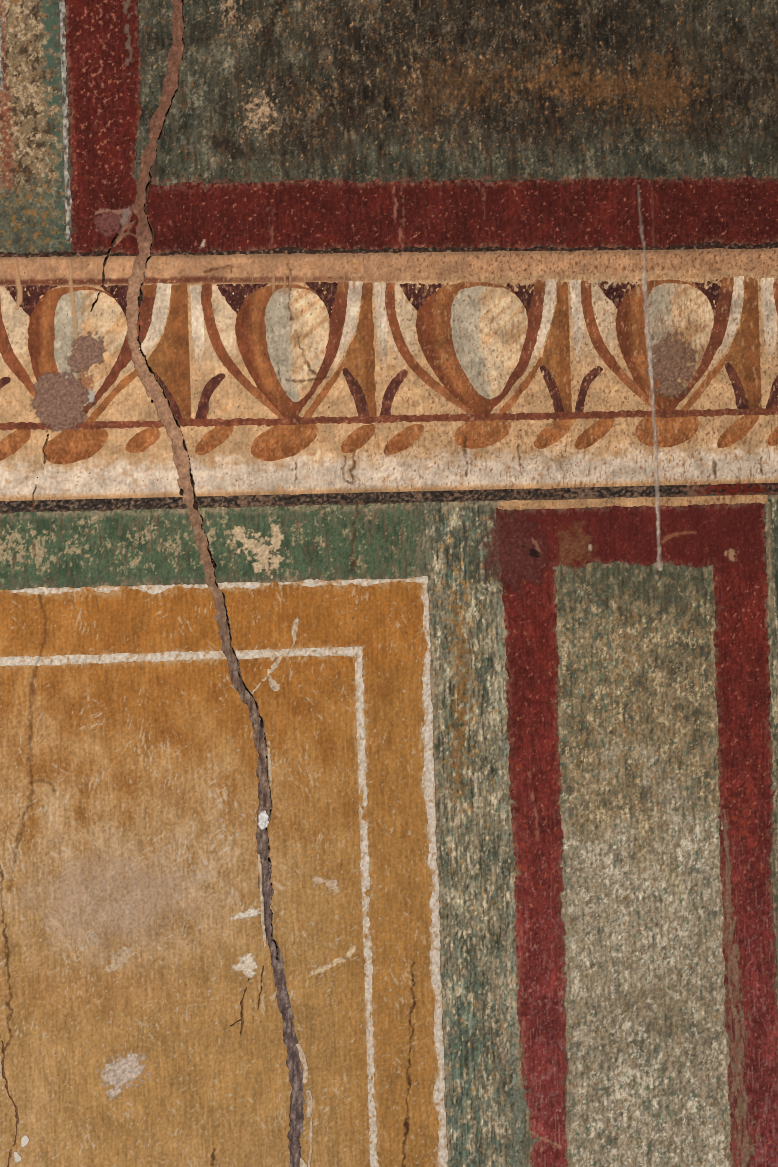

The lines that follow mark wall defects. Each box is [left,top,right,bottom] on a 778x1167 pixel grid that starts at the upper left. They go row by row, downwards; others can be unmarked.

peeling [226,523,284,579]
crack [90,0,313,1167]
spalling [232,953,257,978]
crack [0,920,29,1167]
spalling [98,1053,151,1100]
crack [402,1119,410,1160]